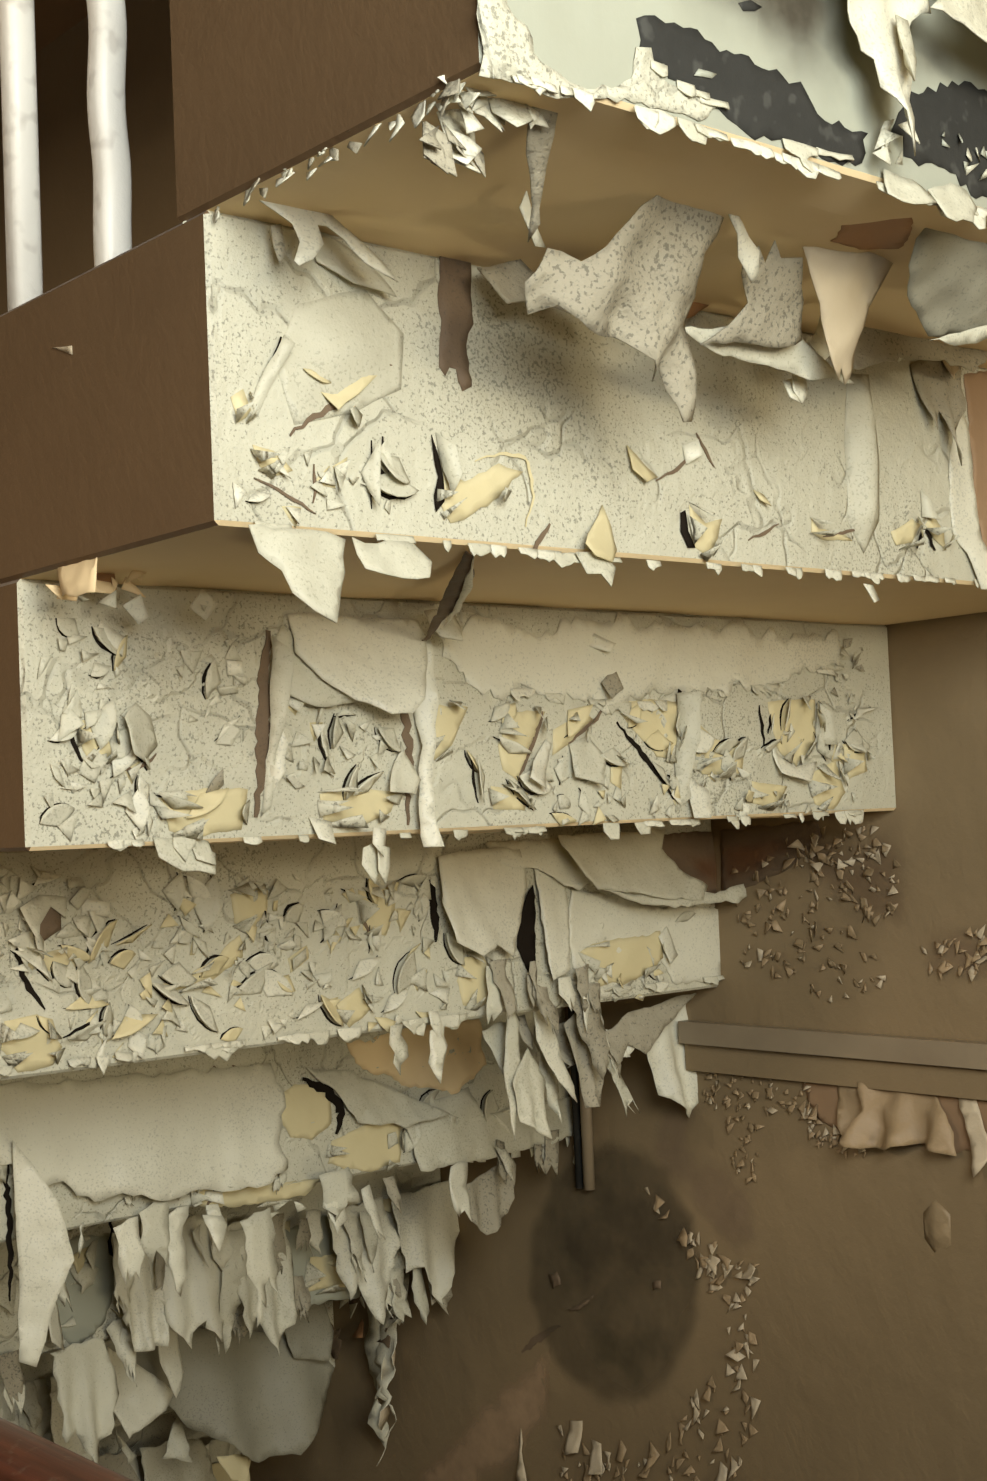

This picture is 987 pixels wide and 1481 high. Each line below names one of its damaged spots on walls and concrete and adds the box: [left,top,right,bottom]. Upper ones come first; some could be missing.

peeling [230,335,295,424]
peeling [243,0,987,603]
water stain [752,0,826,39]
peeling [0,364,987,1481]